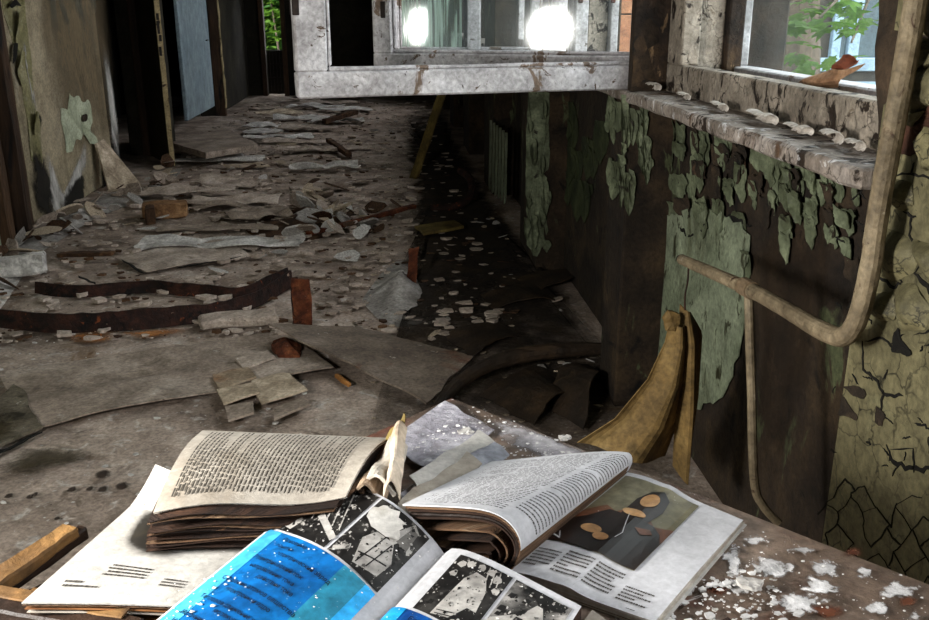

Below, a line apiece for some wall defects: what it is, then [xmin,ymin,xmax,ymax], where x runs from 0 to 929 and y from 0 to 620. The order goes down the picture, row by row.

peeling [1,0,43,163]
peeling [61,93,98,153]
peeling [524,92,551,257]
peeling [604,94,654,216]
peeling [658,120,860,410]
crack [835,190,866,243]
crack [880,266,929,306]
crack [903,211,916,242]
crack [897,162,929,179]
crack [832,318,929,476]
crack [817,478,929,583]